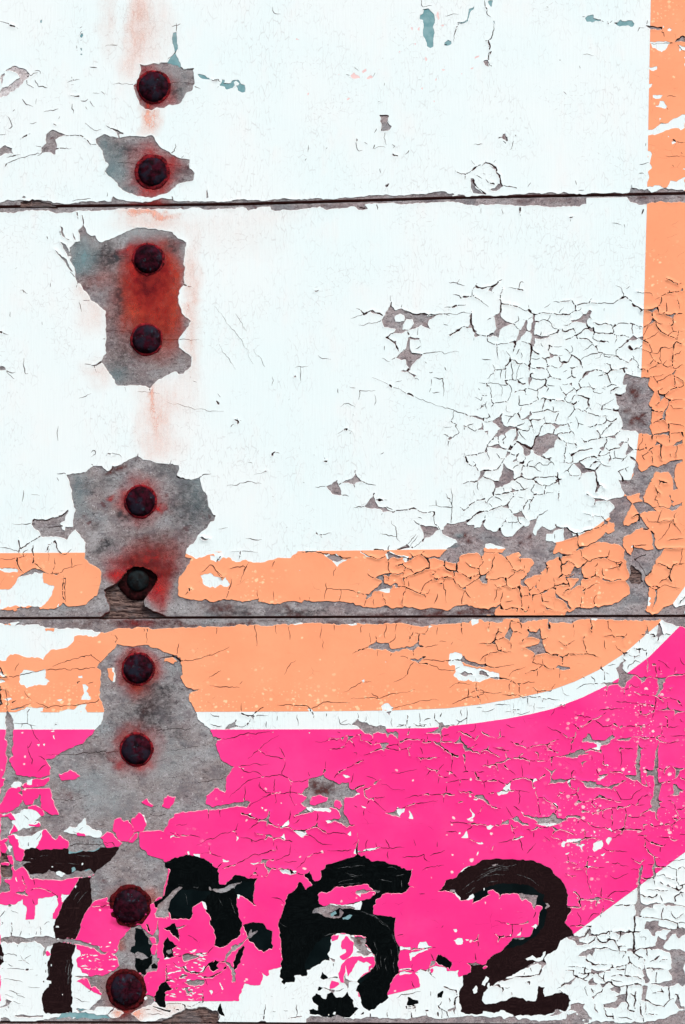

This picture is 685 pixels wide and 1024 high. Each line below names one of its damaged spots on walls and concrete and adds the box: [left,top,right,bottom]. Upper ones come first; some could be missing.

peeling [116,24,245,110]
corrosion [129,151,175,220]
peeling [0,84,685,396]
corrosion [122,243,181,356]
peeling [615,374,654,435]
crack [186,527,328,600]
crack [209,278,685,1024]
crack [0,667,104,769]
peeling [0,450,685,1024]
corrosion [109,884,152,928]
corrosion [105,968,147,1018]
crack [157,929,238,1022]